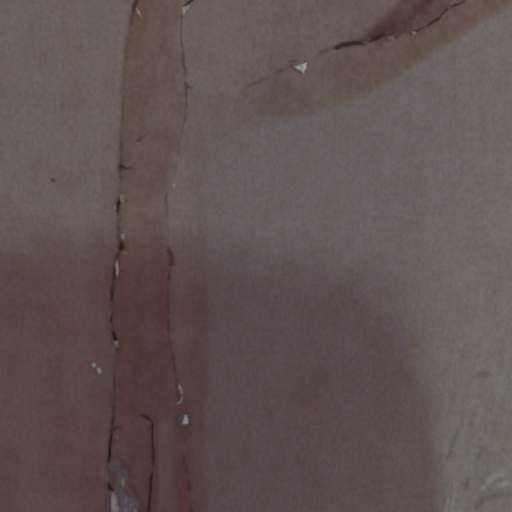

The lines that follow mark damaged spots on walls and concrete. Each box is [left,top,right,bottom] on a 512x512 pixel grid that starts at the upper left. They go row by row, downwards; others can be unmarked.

crack [335,35,385,49]
crack [114,242,123,276]
crack [107,420,119,463]
crack [143,415,154,512]